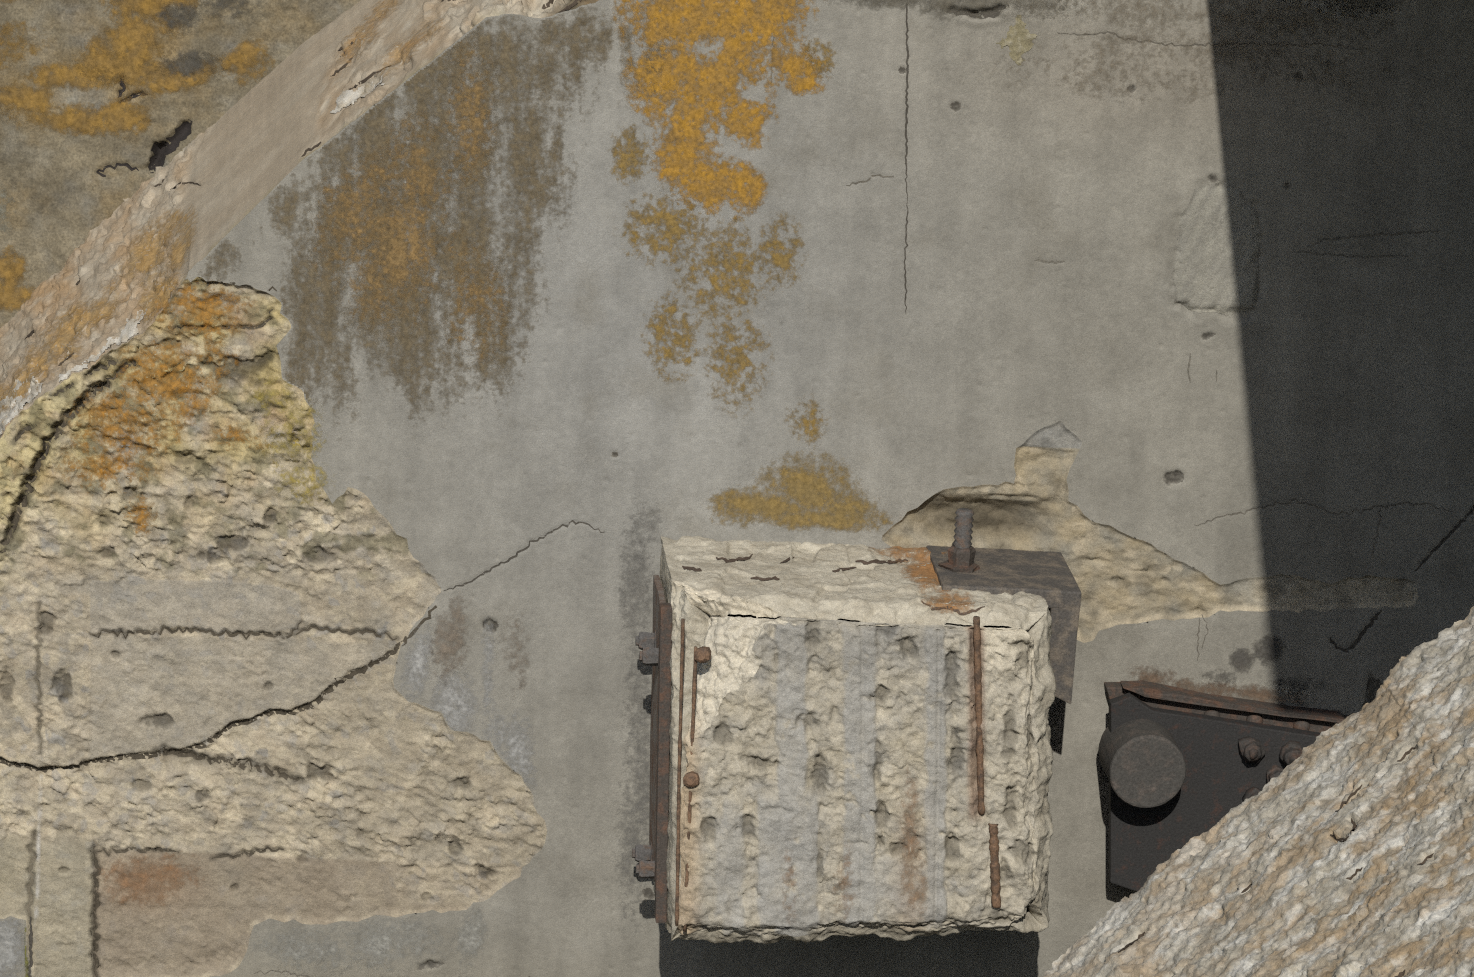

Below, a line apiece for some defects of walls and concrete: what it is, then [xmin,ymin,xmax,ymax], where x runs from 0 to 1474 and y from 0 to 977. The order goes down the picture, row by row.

water stain [164,51,213,77]
water stain [269,8,631,406]
crack [846,4,909,313]
spalling [0,277,547,977]
crack [0,520,603,782]
rust [873,546,974,610]
spalling [882,421,1474,653]